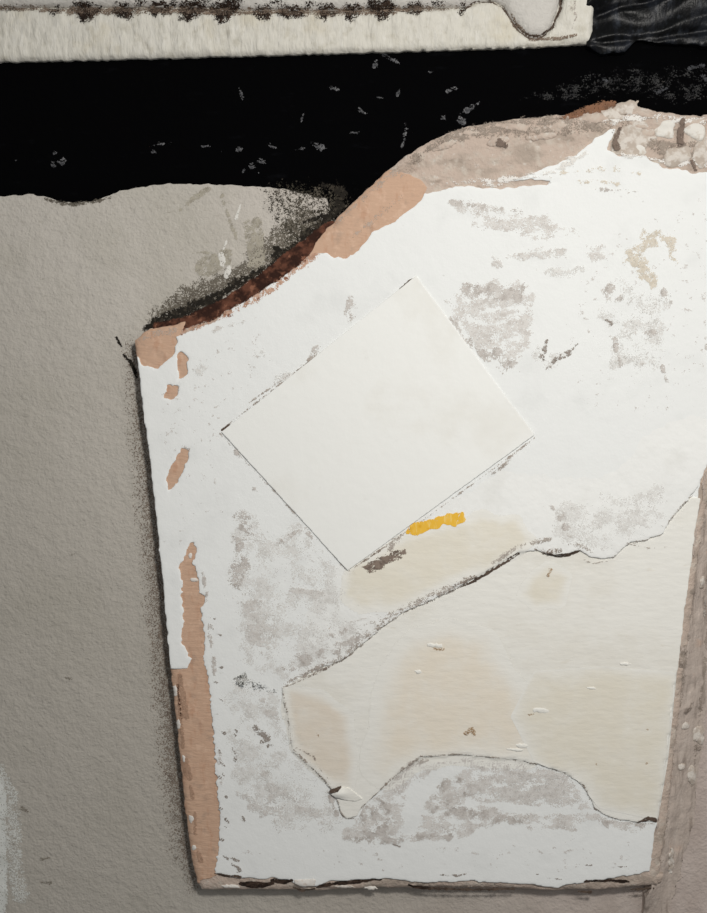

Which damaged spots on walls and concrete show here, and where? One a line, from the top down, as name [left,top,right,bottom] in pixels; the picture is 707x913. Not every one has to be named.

peeling [135,322,208,400]
peeling [192,194,266,279]
peeling [344,296,356,322]
spalling [309,64,707,259]
peeling [444,199,608,374]
peeling [597,228,678,382]
damp [517,560,572,611]
peeling [170,511,663,894]
damp [281,618,690,866]